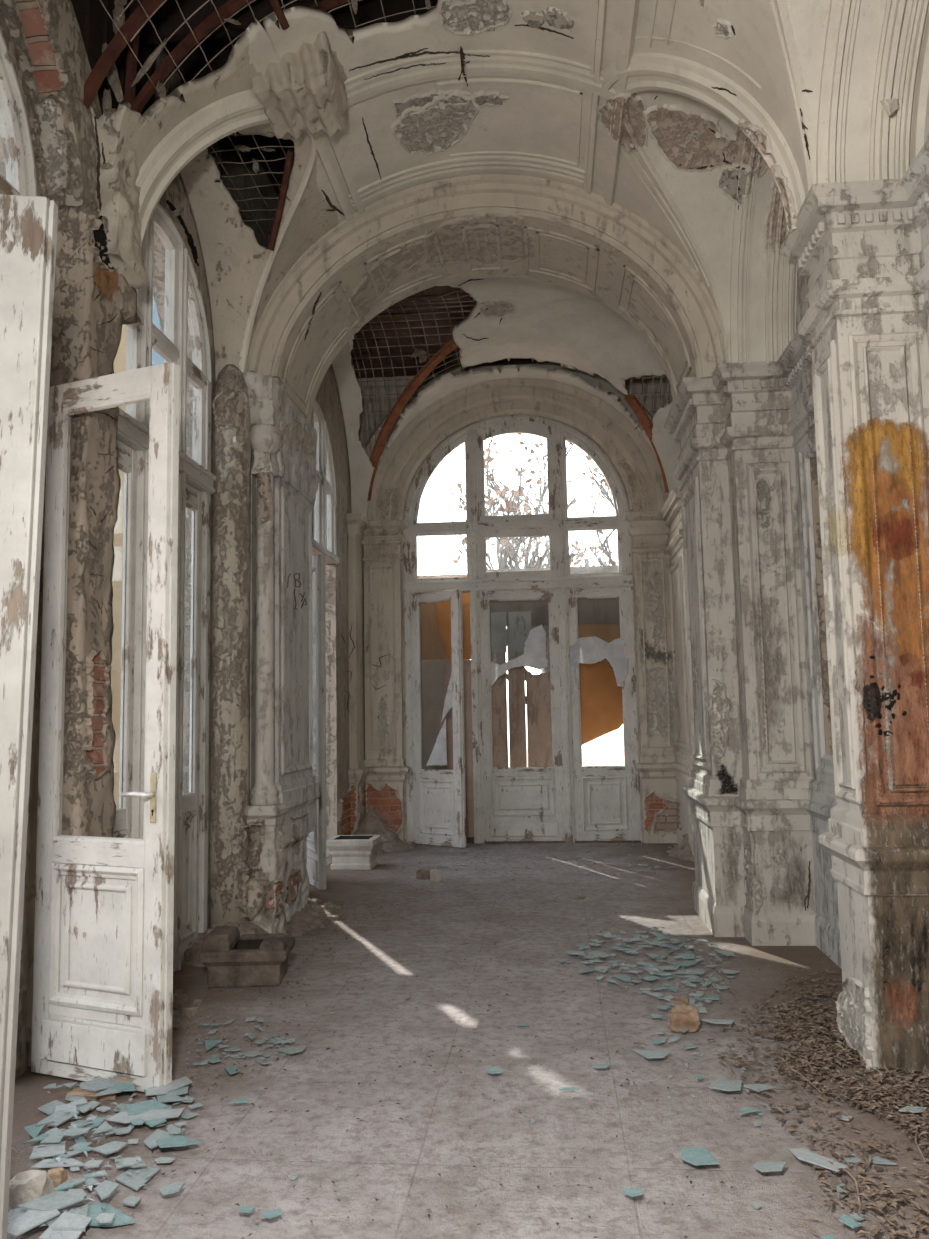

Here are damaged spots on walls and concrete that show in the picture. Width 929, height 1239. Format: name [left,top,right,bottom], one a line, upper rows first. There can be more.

flaking render [14,0,68,100]
spalling [210,134,294,251]
spalling [71,0,574,115]
crack [349,46,490,87]
spalling [391,89,509,155]
spalling [597,92,797,254]
flaking render [83,648,112,780]
flaking render [337,780,406,835]
flaking render [642,790,682,836]
leakage [862,767,929,1073]